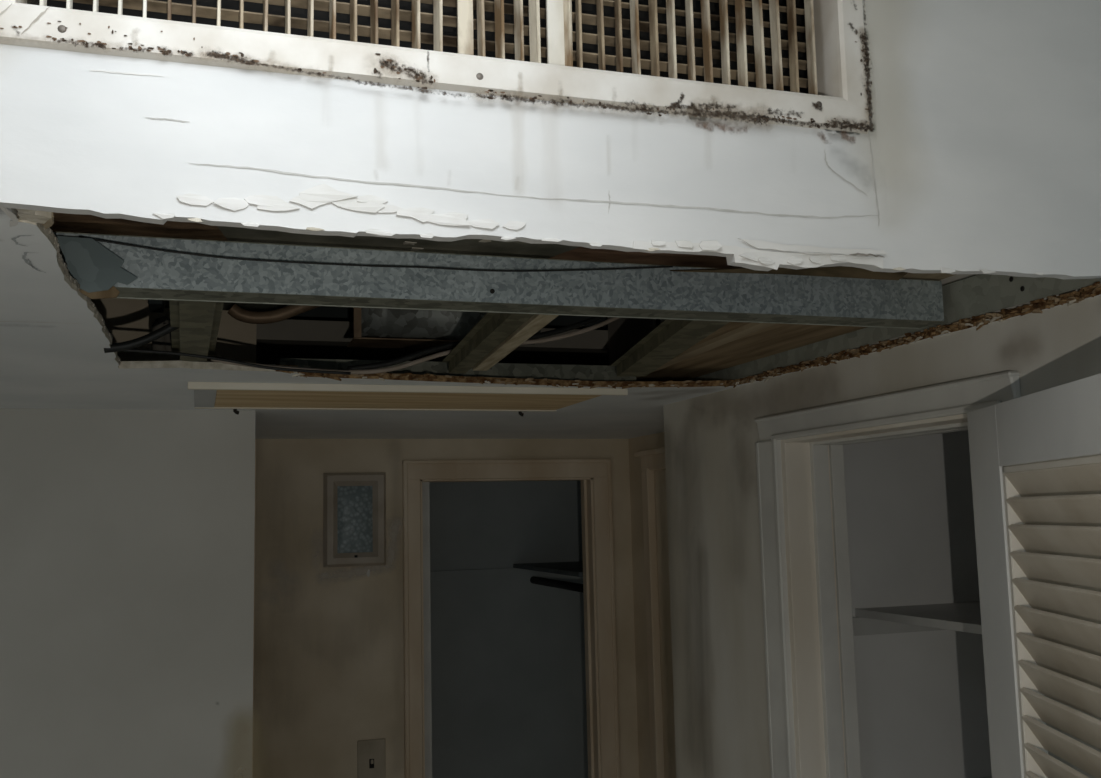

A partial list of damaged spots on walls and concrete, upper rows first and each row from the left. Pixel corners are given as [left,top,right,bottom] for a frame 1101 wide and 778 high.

leakage [46,21,462,97]
leakage [477,4,874,132]
peeling [633,238,906,271]
spalling [279,281,1101,389]